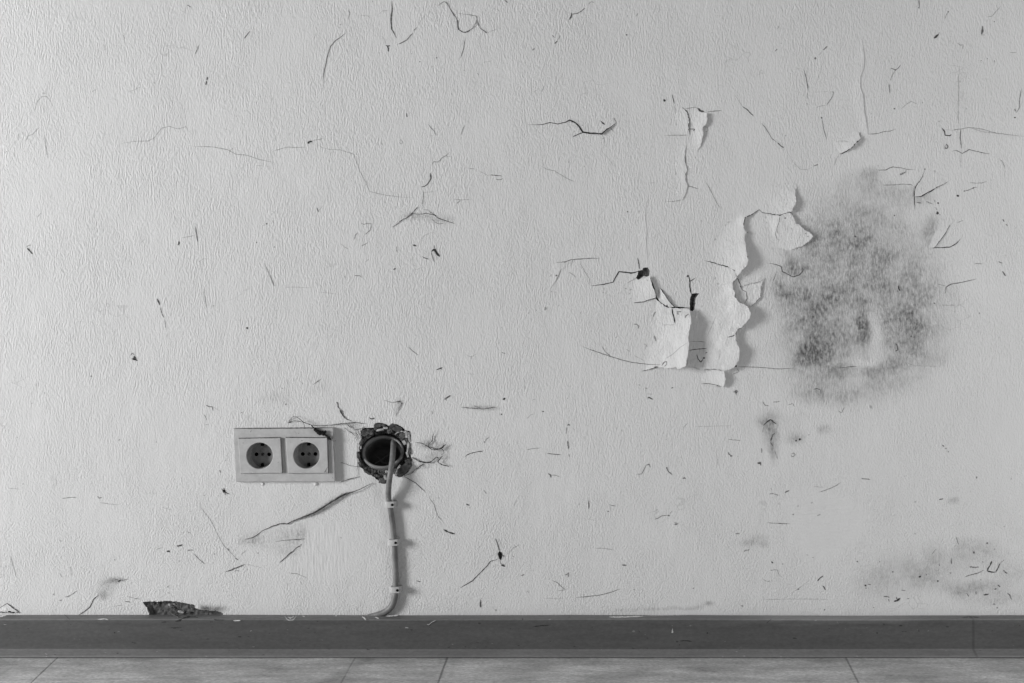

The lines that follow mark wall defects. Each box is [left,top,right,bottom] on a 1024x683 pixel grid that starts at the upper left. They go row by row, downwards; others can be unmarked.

crack [538,115,616,137]
peeling [664,107,722,152]
crack [556,257,640,286]
peeling [629,181,813,387]
leakage [780,285,846,363]
flaking render [357,423,412,484]
flaking render [143,601,223,615]